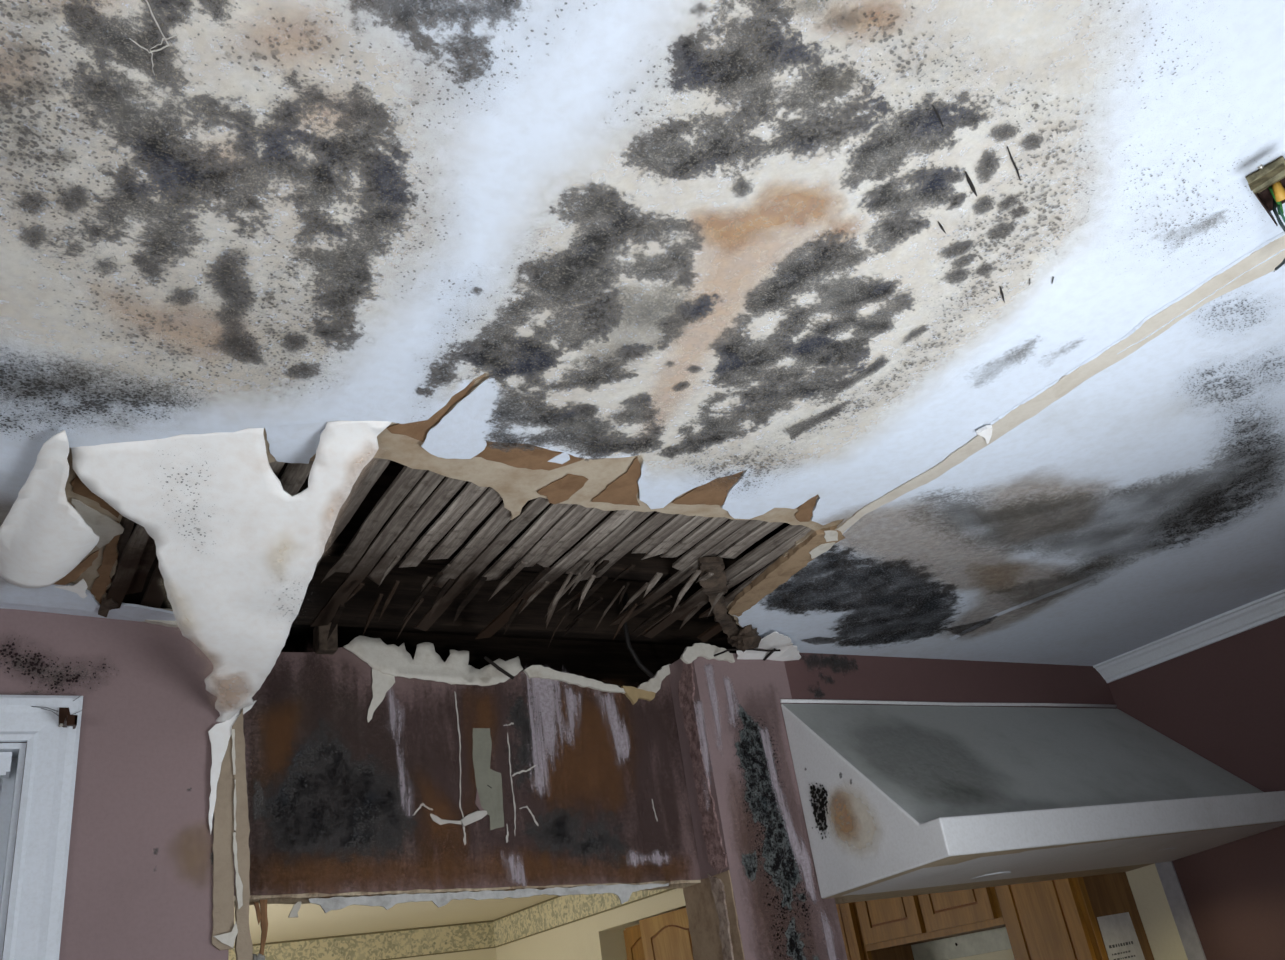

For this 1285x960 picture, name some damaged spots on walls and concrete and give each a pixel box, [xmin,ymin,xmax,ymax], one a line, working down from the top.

mould [0,0,595,441]
damp [410,0,1220,494]
spalling [211,708,265,960]
spalling [281,627,314,652]
peeling [421,377,498,459]
spalling [308,629,745,960]
peeling [548,452,570,464]
efflorescence [601,692,630,764]
damp [695,664,836,960]
flaking render [728,526,845,617]
mould [762,545,997,698]
damp [927,346,1285,604]